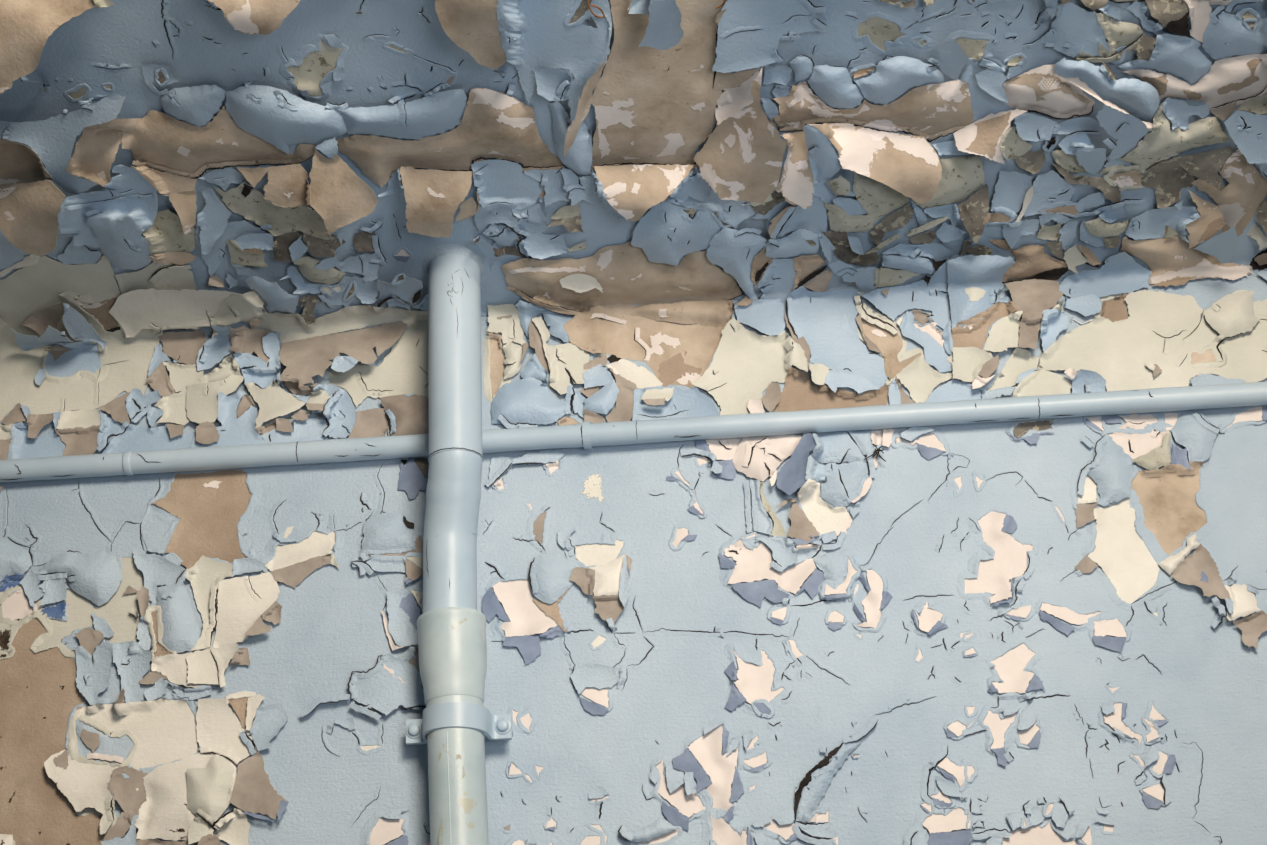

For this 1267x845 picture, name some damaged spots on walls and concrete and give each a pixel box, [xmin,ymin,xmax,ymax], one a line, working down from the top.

peeling [0,165,429,460]
peeling [483,0,1267,422]
peeling [0,467,430,845]
peeling [482,501,632,665]
crack [649,435,717,496]
crack [558,596,854,741]
peeling [629,471,892,845]
crack [764,403,1110,845]
peeling [908,411,1217,845]
crack [921,690,1222,845]
crack [1095,581,1182,686]
crack [1211,562,1267,629]